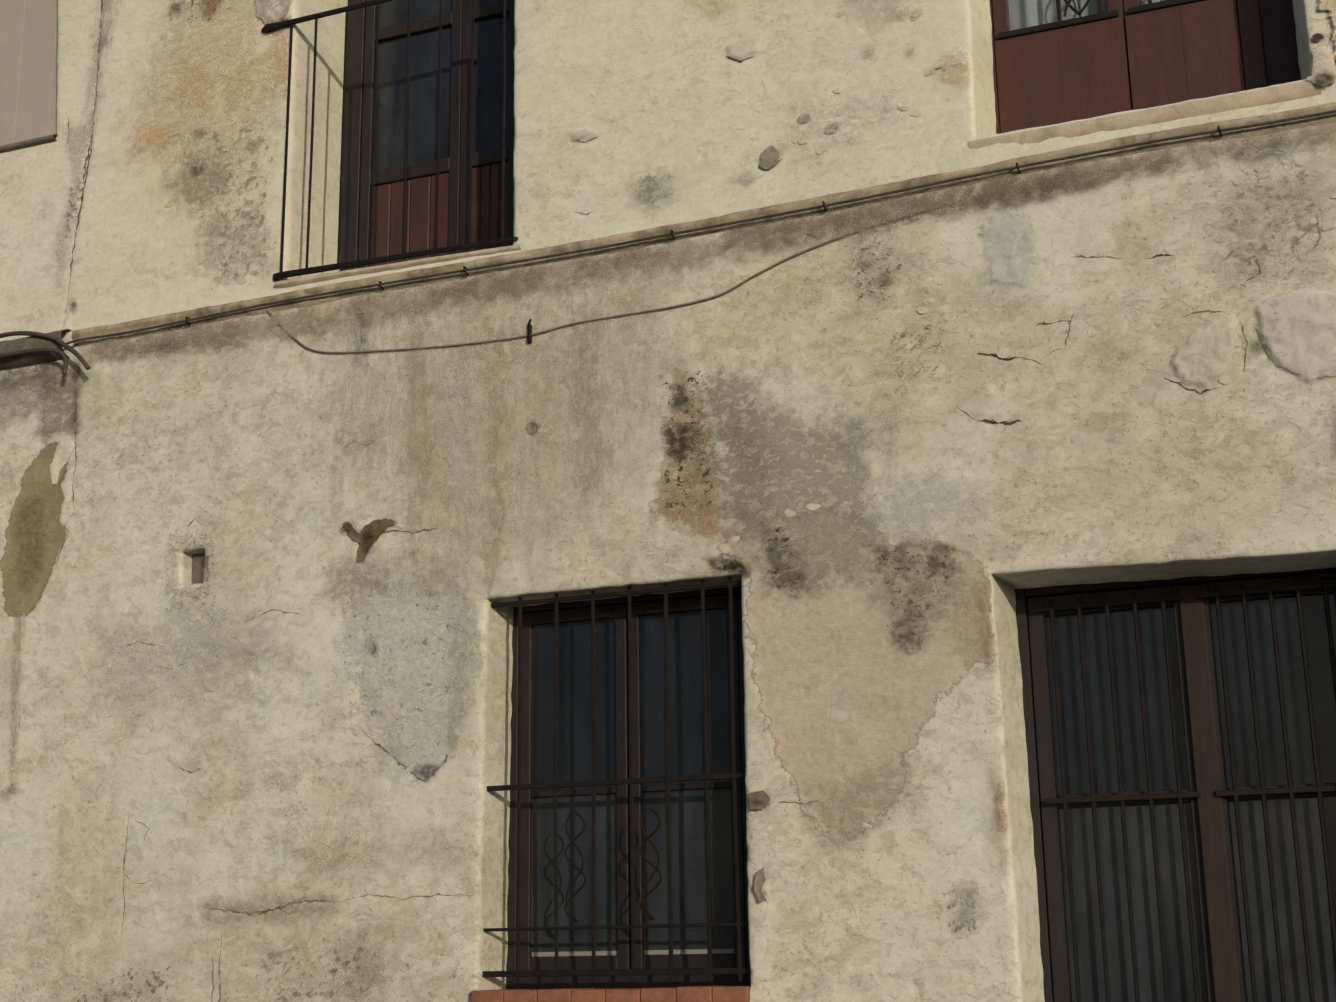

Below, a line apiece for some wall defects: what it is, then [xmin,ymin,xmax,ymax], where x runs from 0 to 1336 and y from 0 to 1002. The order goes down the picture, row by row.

spalling [1306,0,1336,90]
crack [58,0,112,322]
spalling [0,436,75,747]
water stain [761,522,805,592]
peeling [709,371,995,842]
water stain [878,545,960,649]
crack [206,892,469,1002]